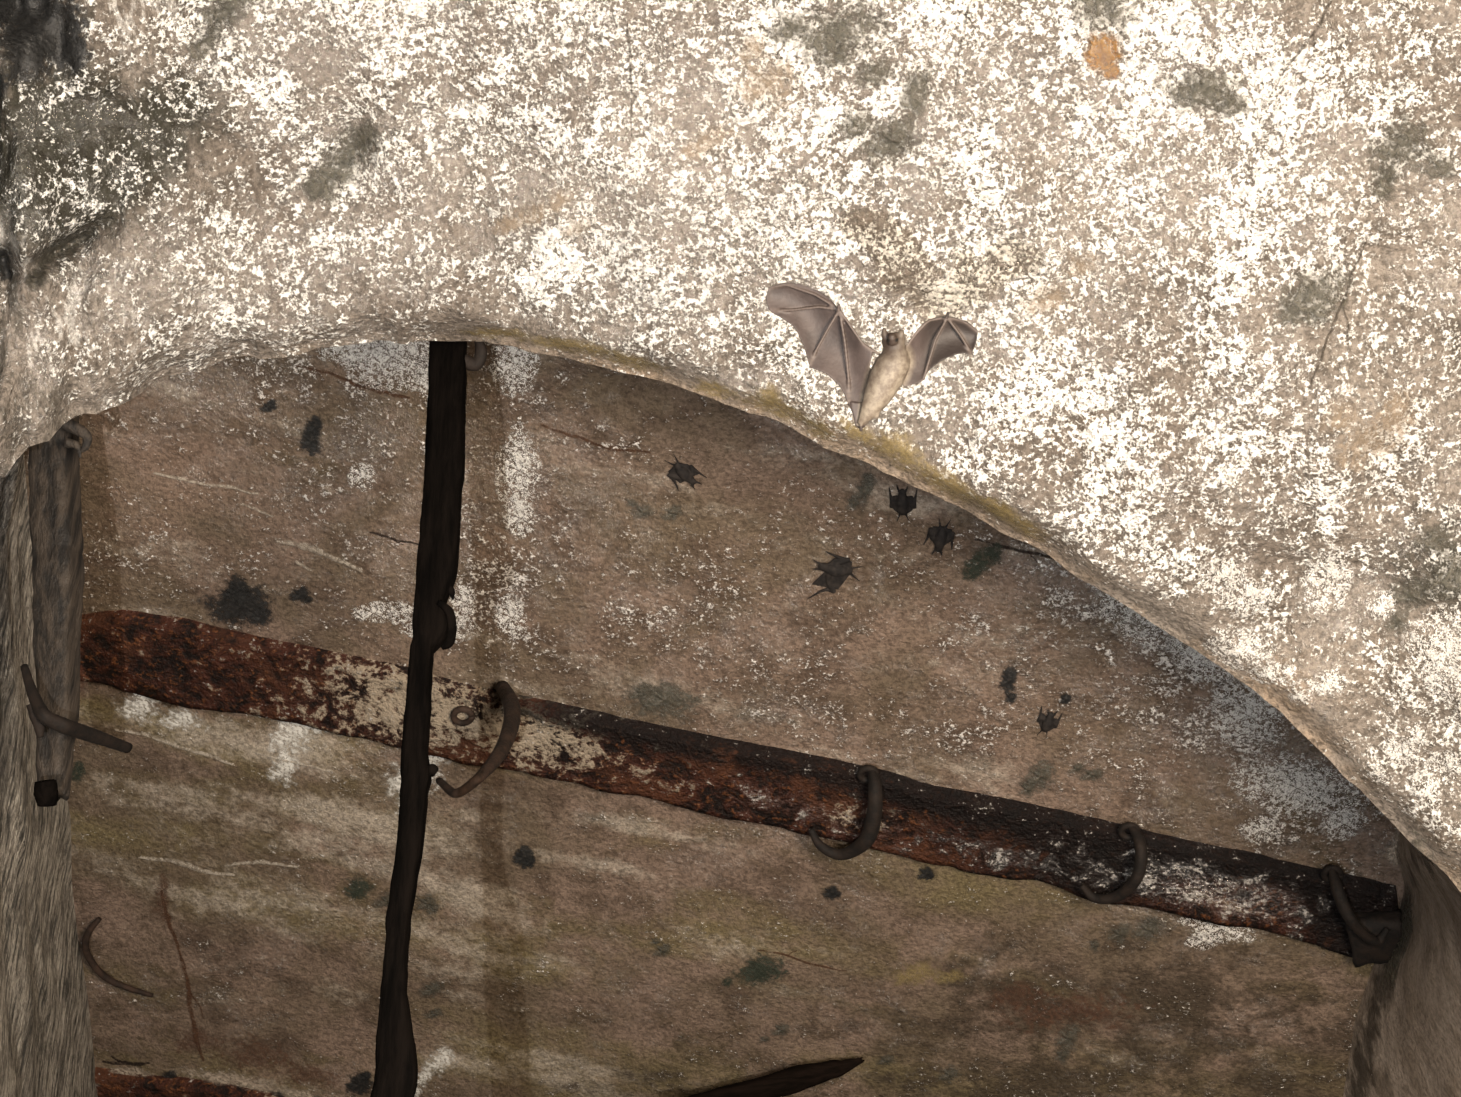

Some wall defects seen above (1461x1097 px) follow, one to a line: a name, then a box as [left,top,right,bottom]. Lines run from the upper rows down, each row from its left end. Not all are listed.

leakage [0,0,93,93]
corrosion [1083,32,1123,80]
crack [1309,242,1366,390]
crack [295,365,410,399]
crack [541,424,650,453]
crack [370,532,418,545]
crack [975,539,1054,563]
leakage [1085,526,1461,844]